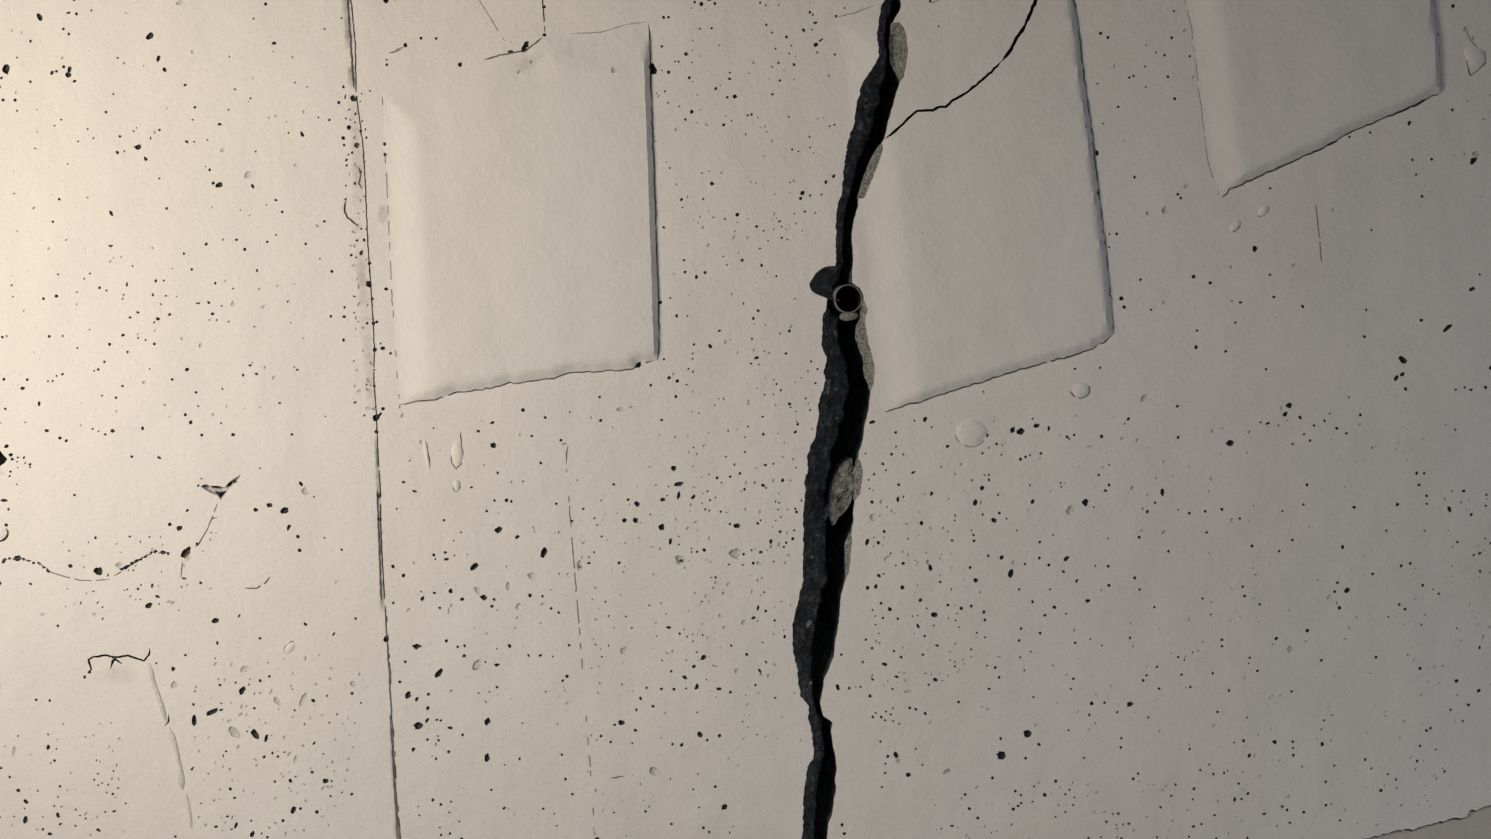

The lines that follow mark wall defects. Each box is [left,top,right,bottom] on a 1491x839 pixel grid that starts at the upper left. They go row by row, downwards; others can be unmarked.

crack [792,0,1038,839]